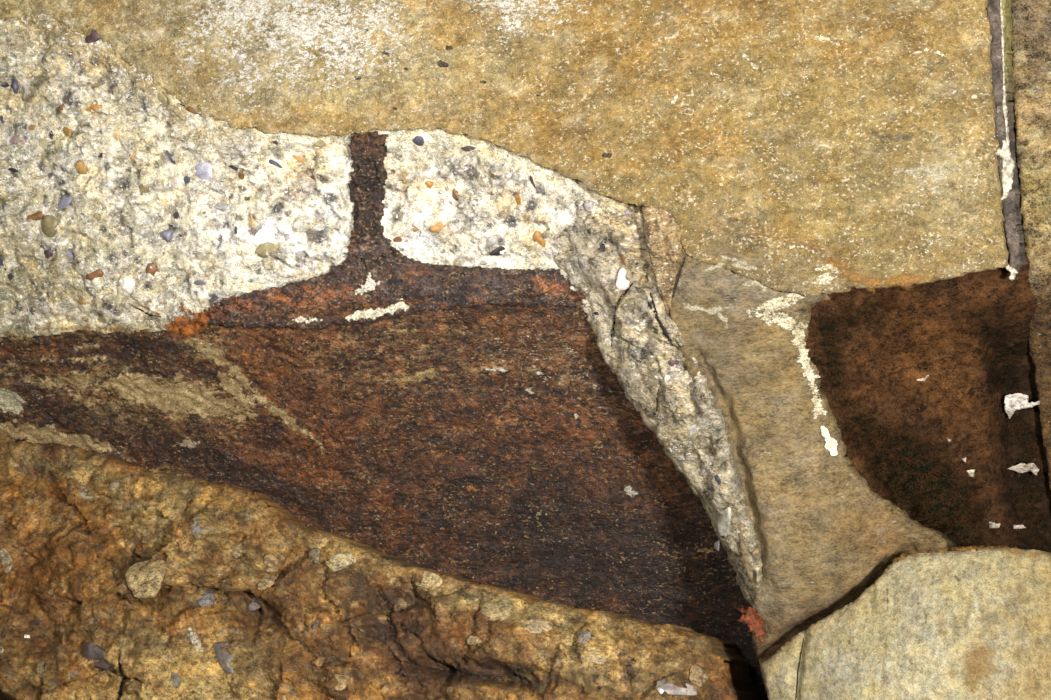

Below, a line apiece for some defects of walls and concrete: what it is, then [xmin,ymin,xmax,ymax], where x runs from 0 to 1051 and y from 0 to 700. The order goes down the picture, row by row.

leakage [685,304,733,328]
leakage [705,256,992,551]
leakage [968,322,1051,551]
crack [117,652,125,700]